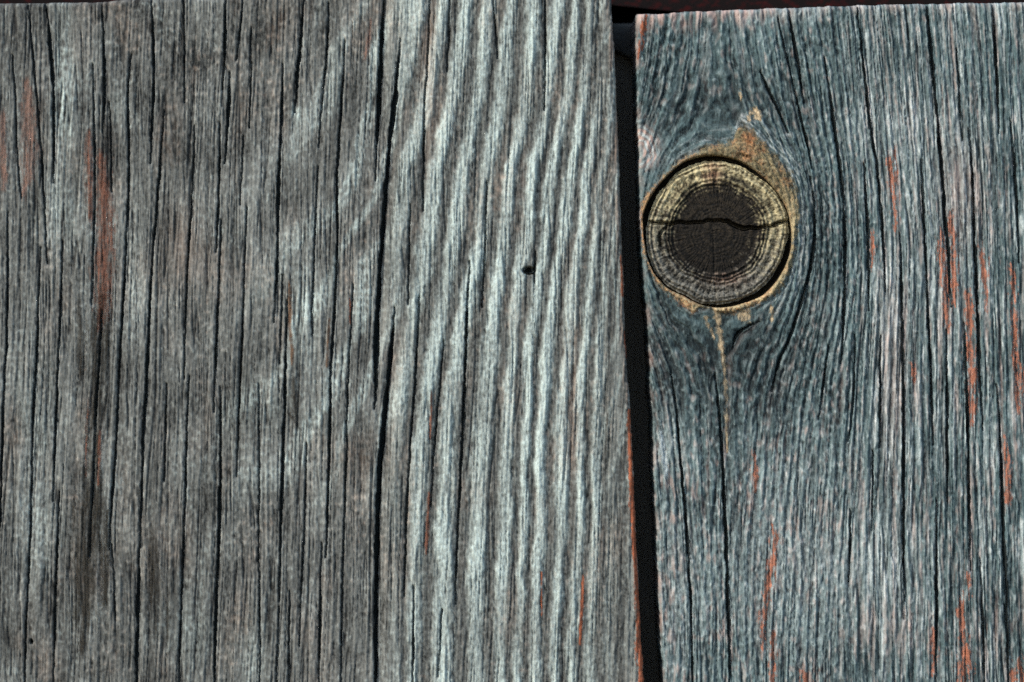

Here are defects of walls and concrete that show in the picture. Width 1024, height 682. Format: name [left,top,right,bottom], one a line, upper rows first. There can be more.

crack [89,0,487,682]
crack [671,375,693,681]
crack [643,9,815,391]